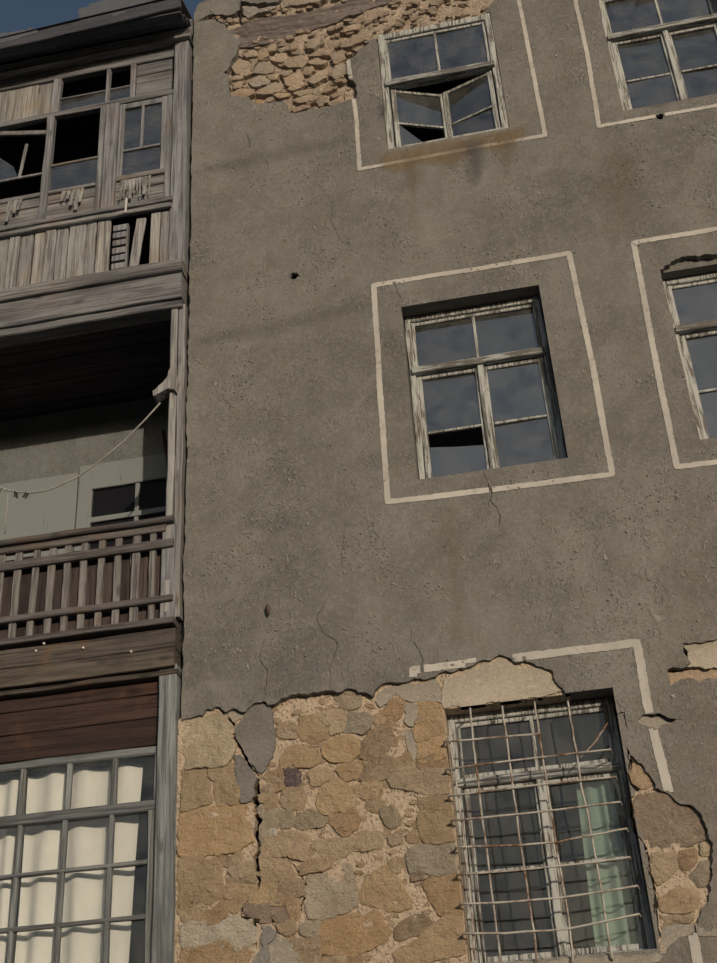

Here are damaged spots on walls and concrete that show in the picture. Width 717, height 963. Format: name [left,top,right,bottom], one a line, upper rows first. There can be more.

flaking render [212,0,494,113]
flaking render [605,0,648,26]
flaking render [661,258,717,292]
flaking render [668,640,717,686]
crack [232,722,263,888]
flaking render [174,656,571,963]
flaking render [623,749,713,954]